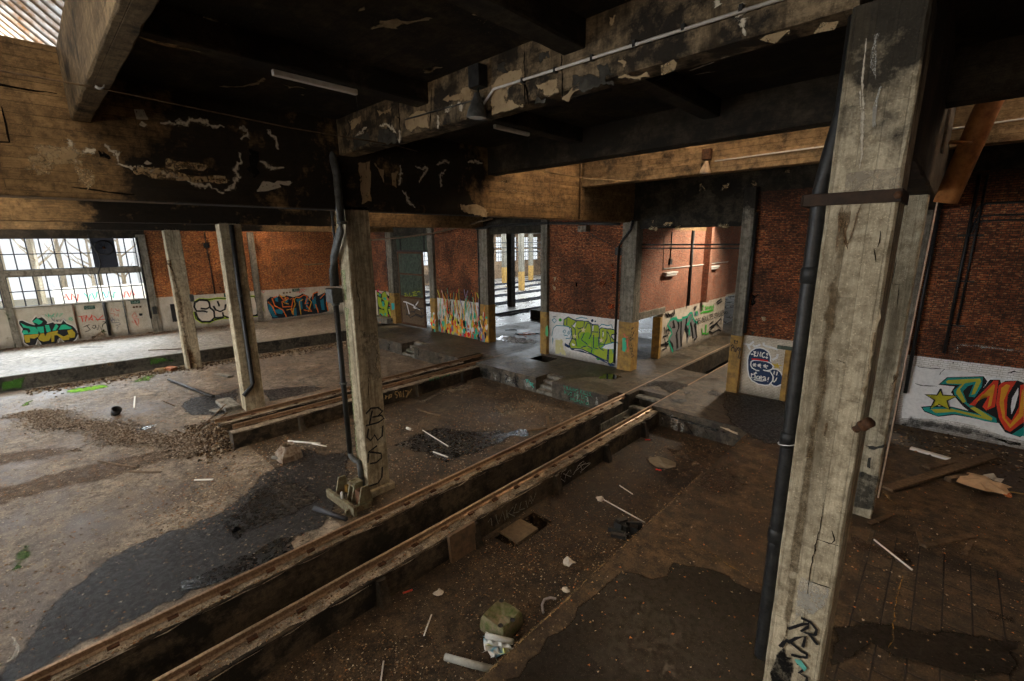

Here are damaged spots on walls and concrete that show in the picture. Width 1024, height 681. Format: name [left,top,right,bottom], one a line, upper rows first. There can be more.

peeling [443,87,473,102]
peeling [490,59,650,115]
peeling [133,158,228,184]
peeling [257,181,293,192]
peeling [348,108,429,204]
leakage [0,450,349,681]
crack [803,510,838,623]